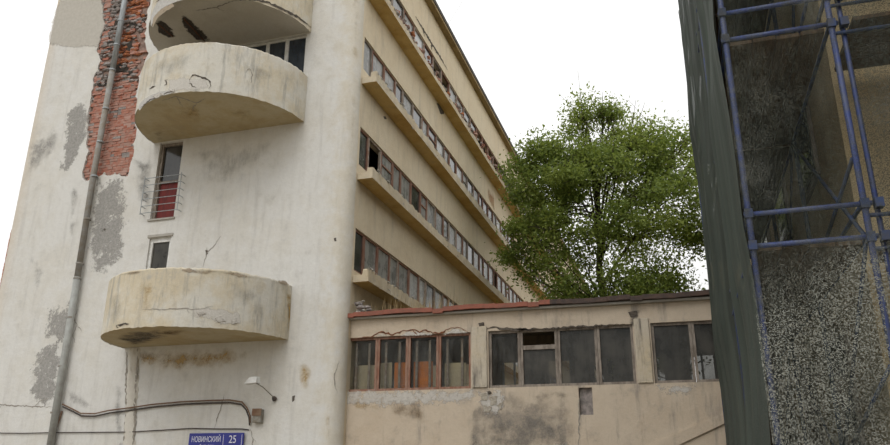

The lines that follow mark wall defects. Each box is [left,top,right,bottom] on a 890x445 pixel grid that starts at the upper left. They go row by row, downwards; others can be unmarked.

spalling [254,0,309,26]
flaking render [49,0,208,181]
water stain [91,178,127,272]
crack [0,398,51,408]
water stain [31,303,69,405]
crack [123,349,138,445]